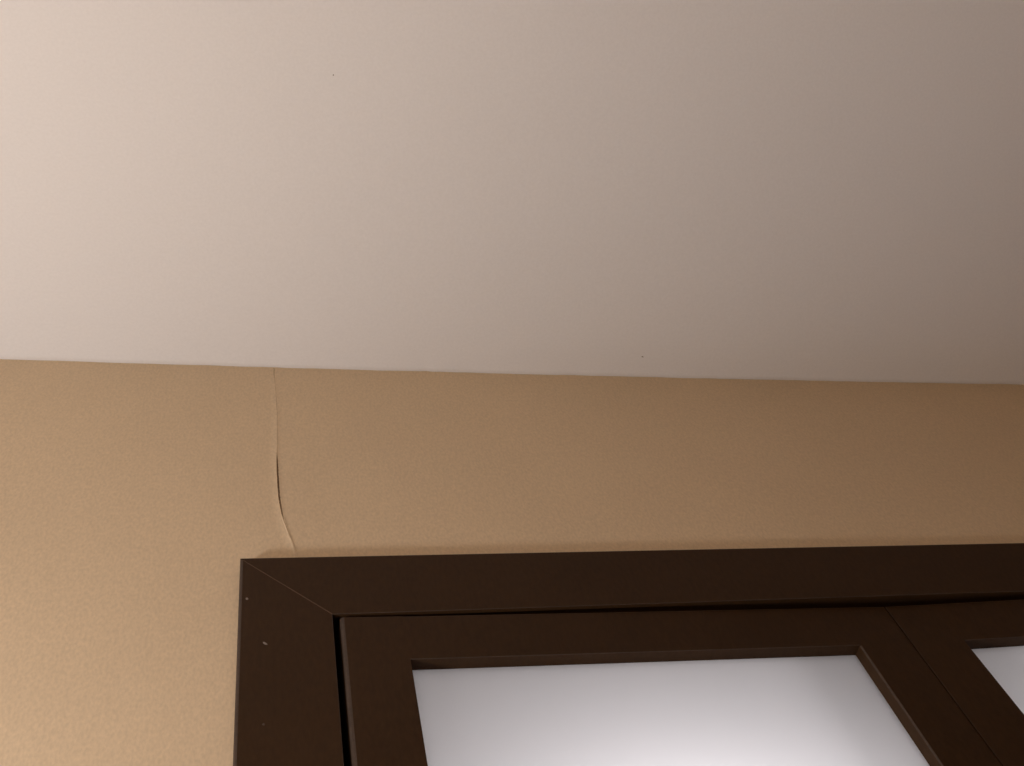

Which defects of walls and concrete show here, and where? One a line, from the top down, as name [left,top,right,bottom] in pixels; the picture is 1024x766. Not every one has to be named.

crack [275,452,297,558]